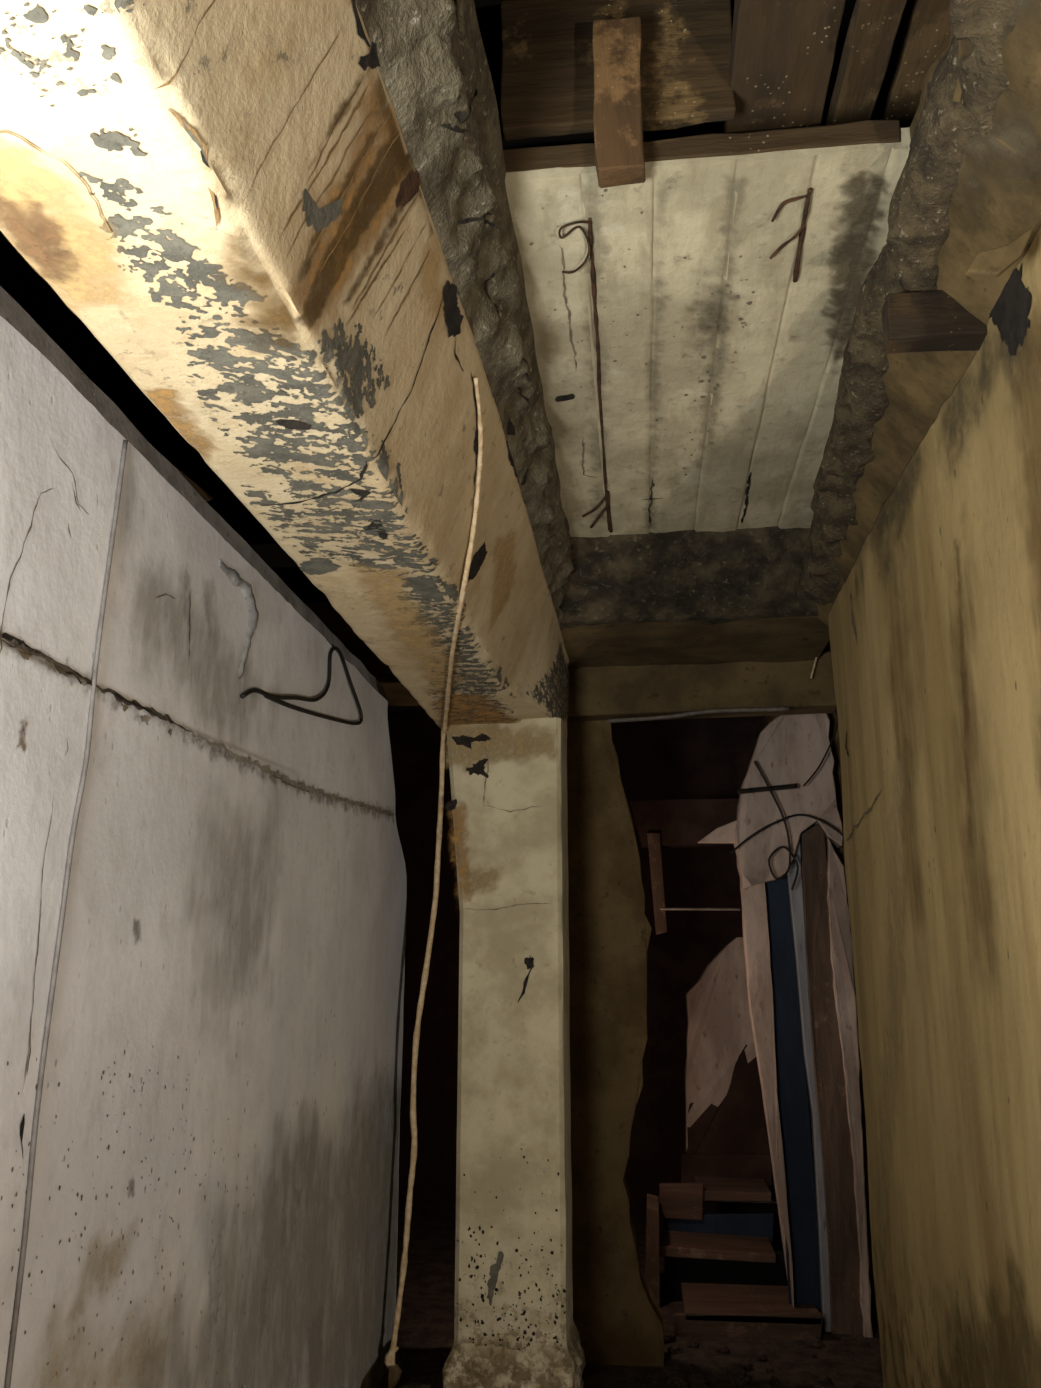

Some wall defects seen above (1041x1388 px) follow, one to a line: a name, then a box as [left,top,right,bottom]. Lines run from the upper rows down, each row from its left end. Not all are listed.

peeling [0,0,145,108]
crack [155,0,370,227]
corrosion [376,77,422,197]
peeling [79,170,570,778]
crack [259,282,477,539]
crack [484,273,499,315]
crack [518,359,532,407]
crack [0,441,394,822]
water stain [180,1090,401,1388]